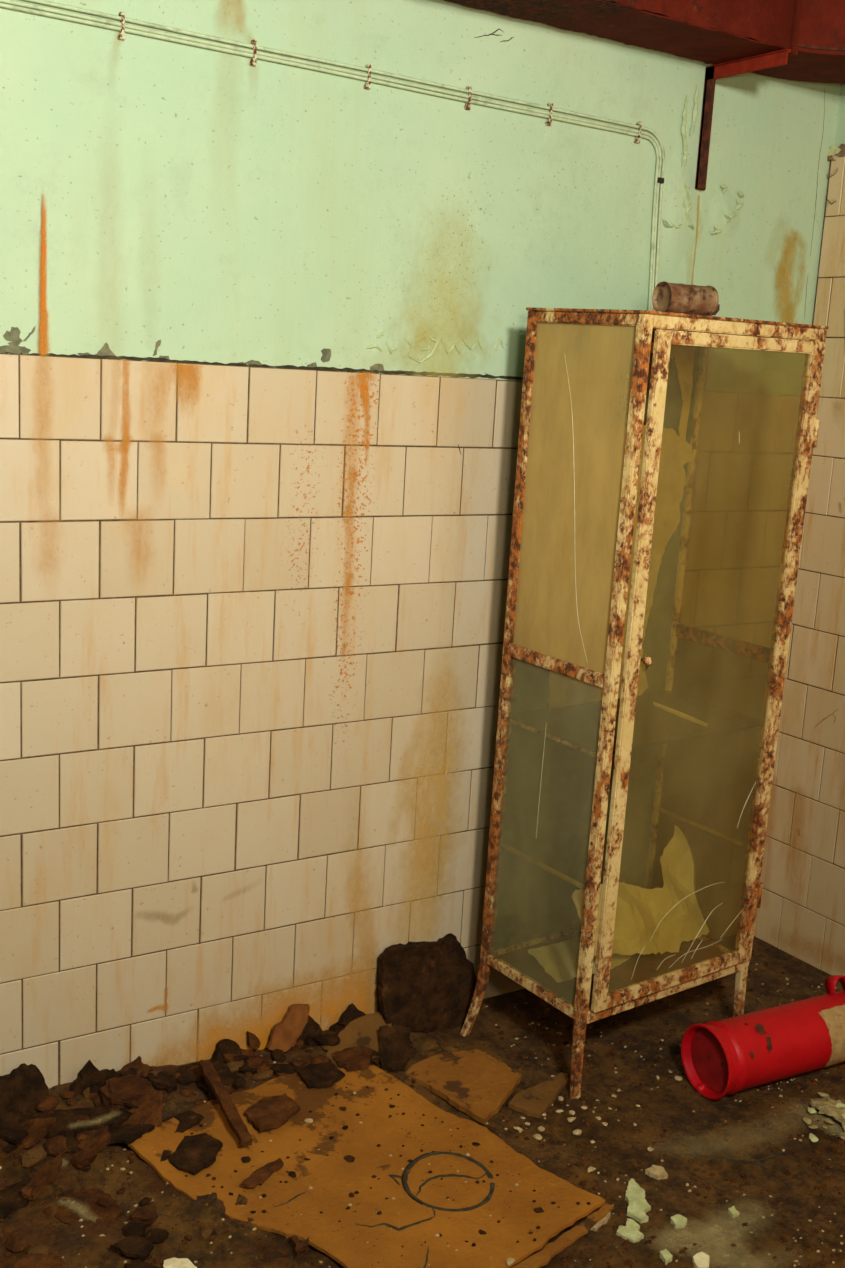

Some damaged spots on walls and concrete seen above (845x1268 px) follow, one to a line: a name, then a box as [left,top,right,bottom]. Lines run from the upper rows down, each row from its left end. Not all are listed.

spalling [827,144,845,161]
rust [39,201,48,355]
damp [777,239,795,323]
rust [121,361,130,494]
rust [289,441,316,583]
rust [333,372,379,733]